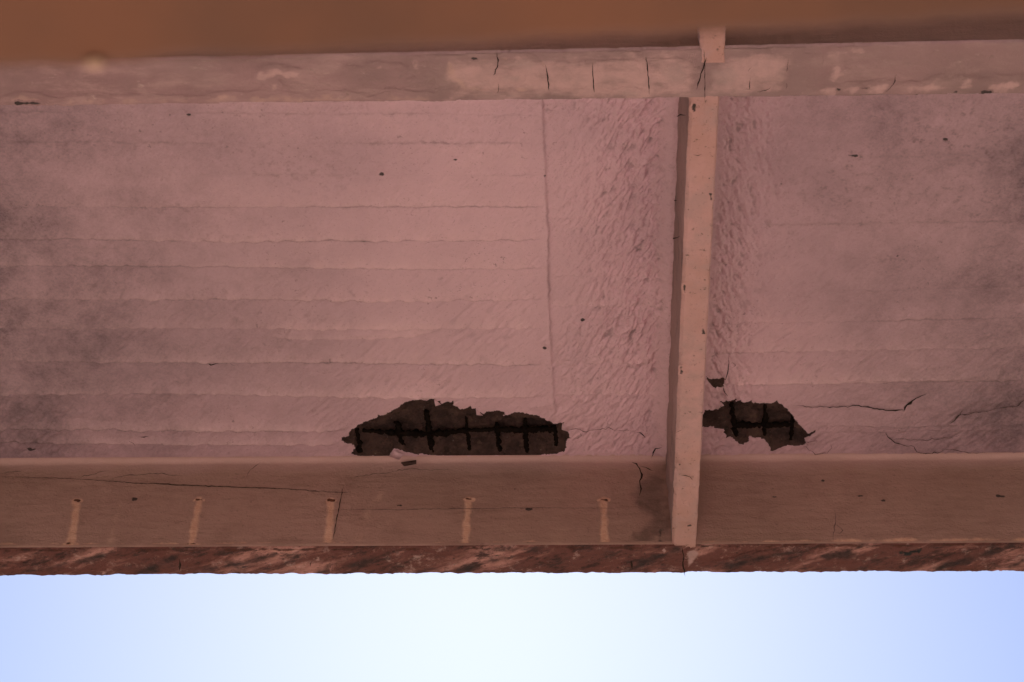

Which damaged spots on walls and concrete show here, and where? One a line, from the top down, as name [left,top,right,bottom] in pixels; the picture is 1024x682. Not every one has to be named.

spalling [342,399,570,466]
crack [571,427,662,495]
spalling [702,399,816,451]
crack [804,395,1024,454]